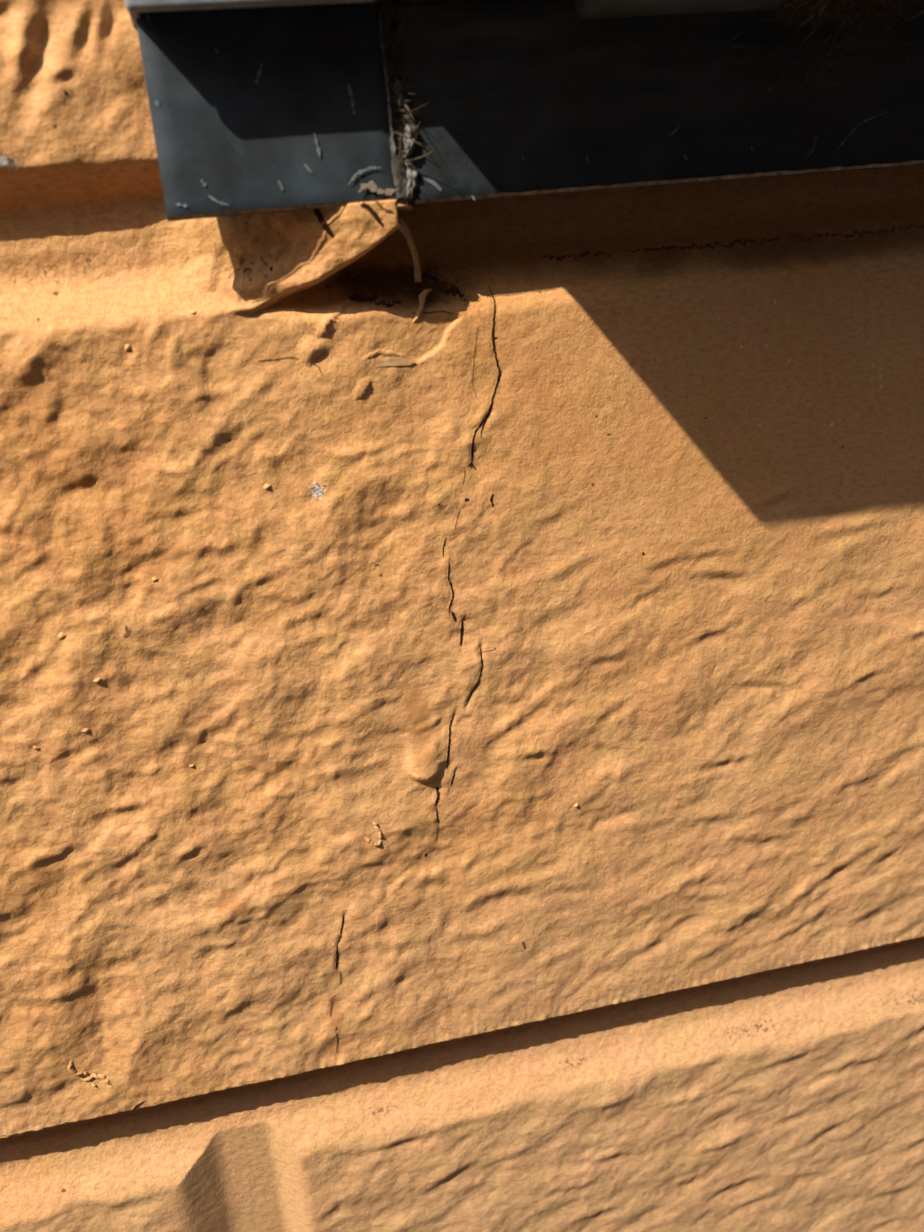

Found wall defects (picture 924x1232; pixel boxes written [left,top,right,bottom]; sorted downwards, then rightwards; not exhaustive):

peeling [311,294,353,338]
peeling [352,348,416,401]
crack [433,285,501,843]
crack [328,915,344,1052]